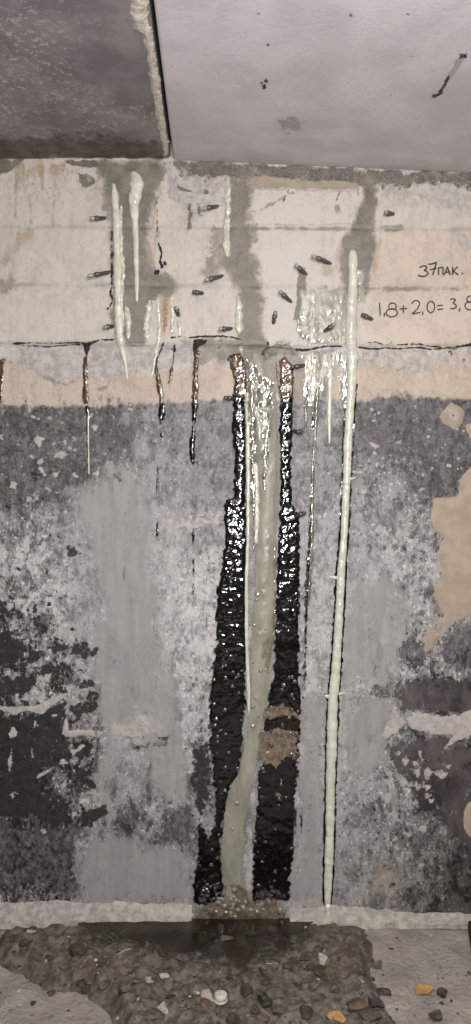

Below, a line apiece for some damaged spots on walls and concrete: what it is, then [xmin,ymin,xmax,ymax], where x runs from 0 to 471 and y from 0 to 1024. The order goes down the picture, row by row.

crack [13,338,114,356]
damp [0,131,471,551]
crack [155,335,471,368]
corrosion [191,350,200,403]
corrosion [227,353,247,400]
corrosion [276,356,295,399]
peeling [352,391,471,656]